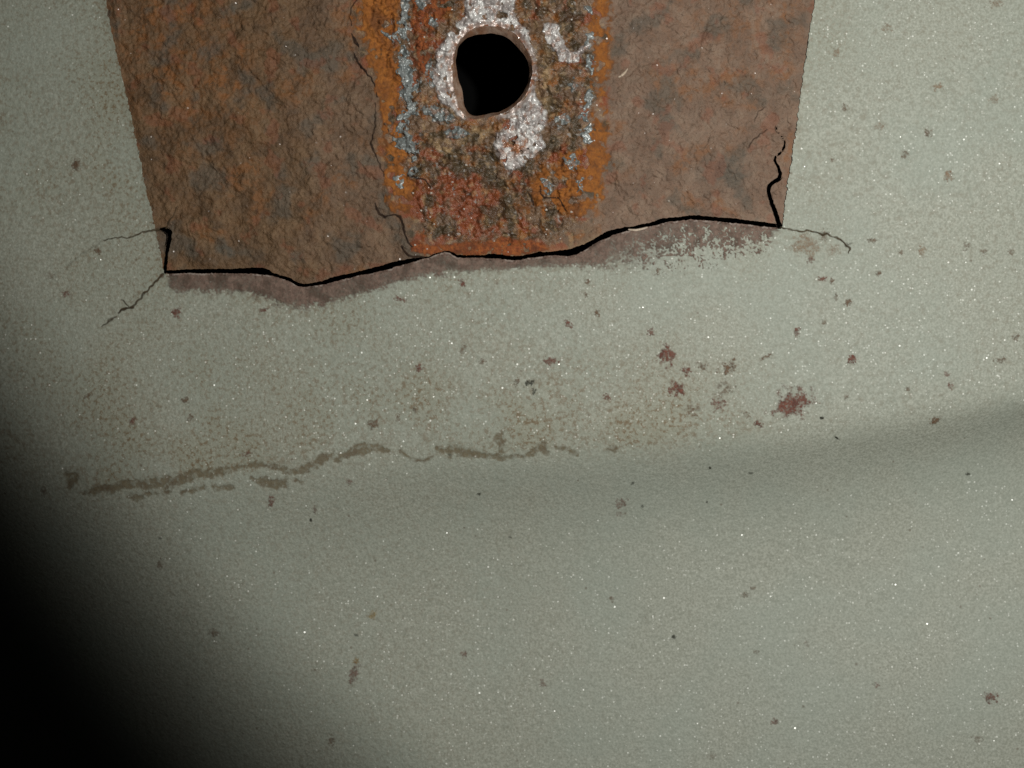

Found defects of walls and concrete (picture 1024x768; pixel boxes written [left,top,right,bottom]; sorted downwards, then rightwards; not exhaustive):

rust [106,0,815,312]
crack [486,122,851,260]
crack [104,203,457,325]
rust [659,346,735,396]
rust [756,387,811,426]